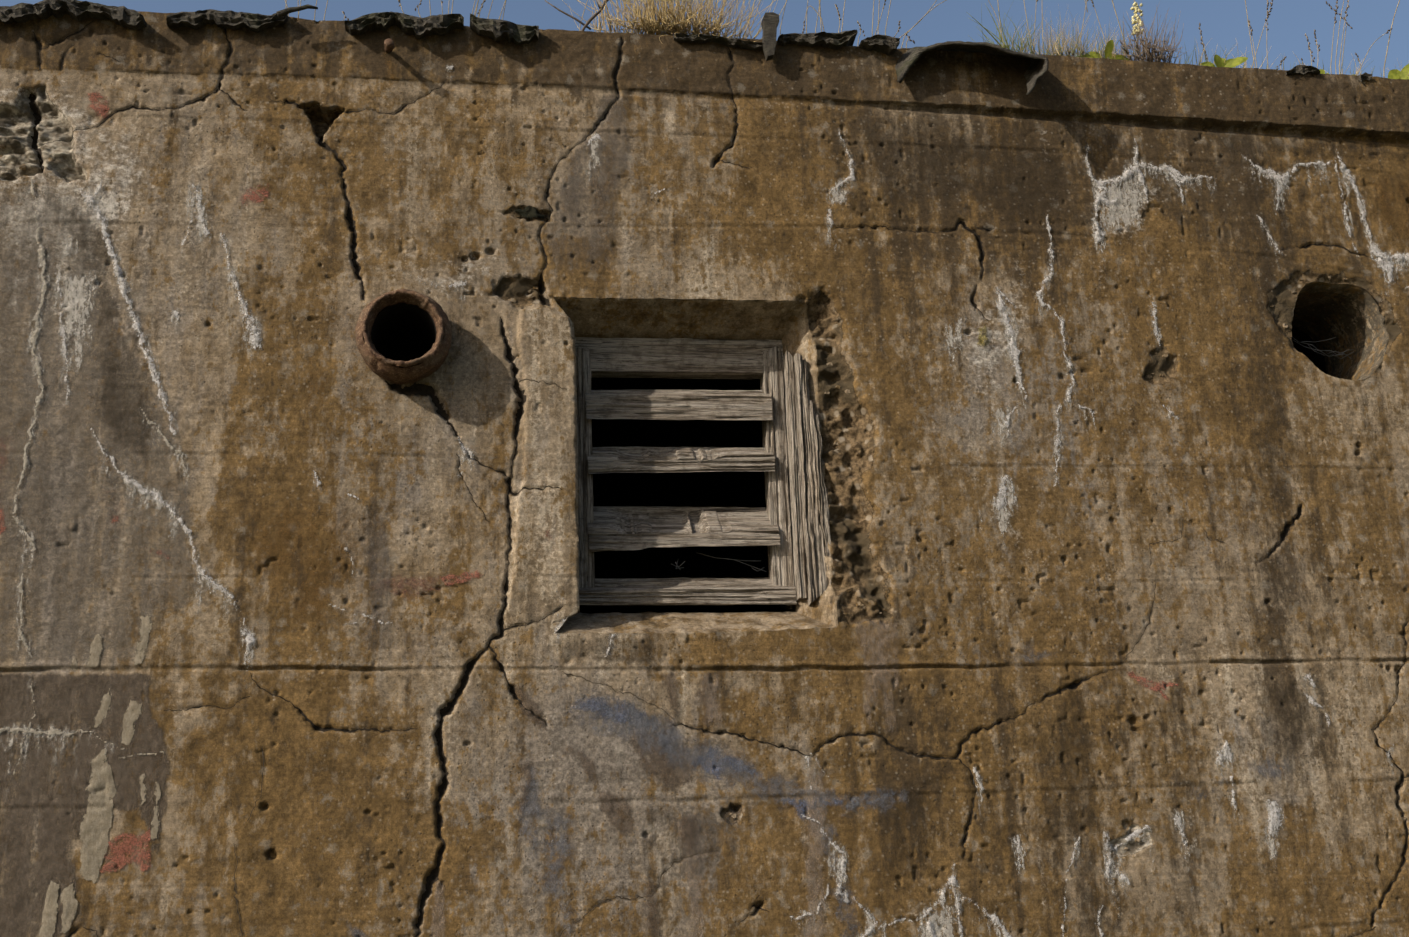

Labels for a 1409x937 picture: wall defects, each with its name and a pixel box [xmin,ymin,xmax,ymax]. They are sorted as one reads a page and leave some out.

spalling [0,86,87,182]
leakage [11,178,99,658]
leakage [79,182,190,478]
crack [164,317,567,937]
crack [538,37,624,306]
spalling [799,290,892,627]
crack [562,520,1225,859]
leakage [790,815,1011,937]
leakage [1085,138,1212,252]
crack [1256,505,1302,563]
leakage [1241,149,1409,295]
crack [1351,618,1409,937]